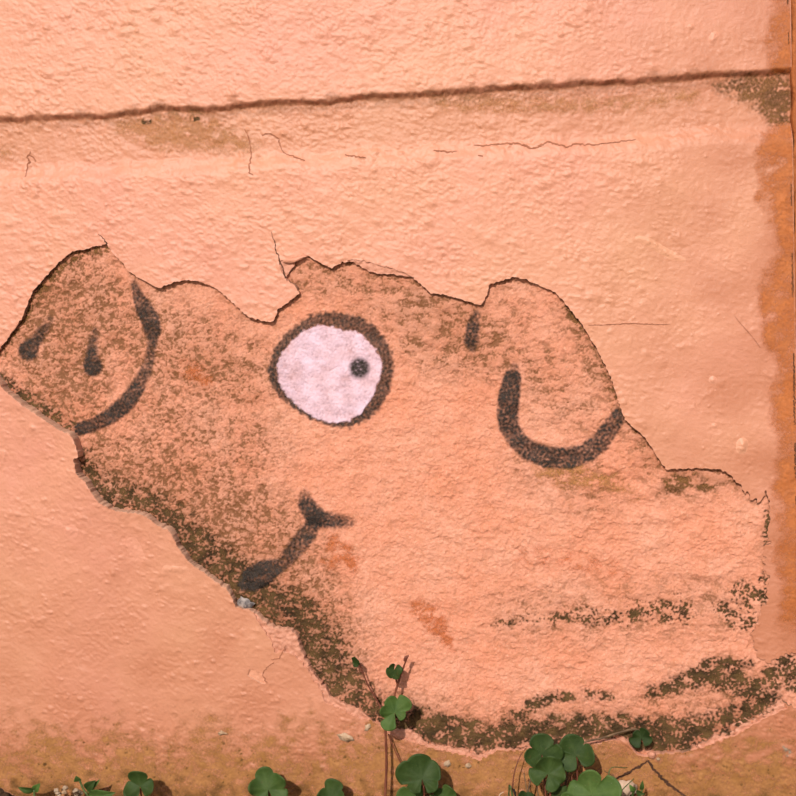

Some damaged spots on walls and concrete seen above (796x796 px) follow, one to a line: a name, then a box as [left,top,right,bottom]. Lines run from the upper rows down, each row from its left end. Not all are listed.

leakage [717,75,791,126]
crack [476,139,635,157]
peeling [0,244,796,769]